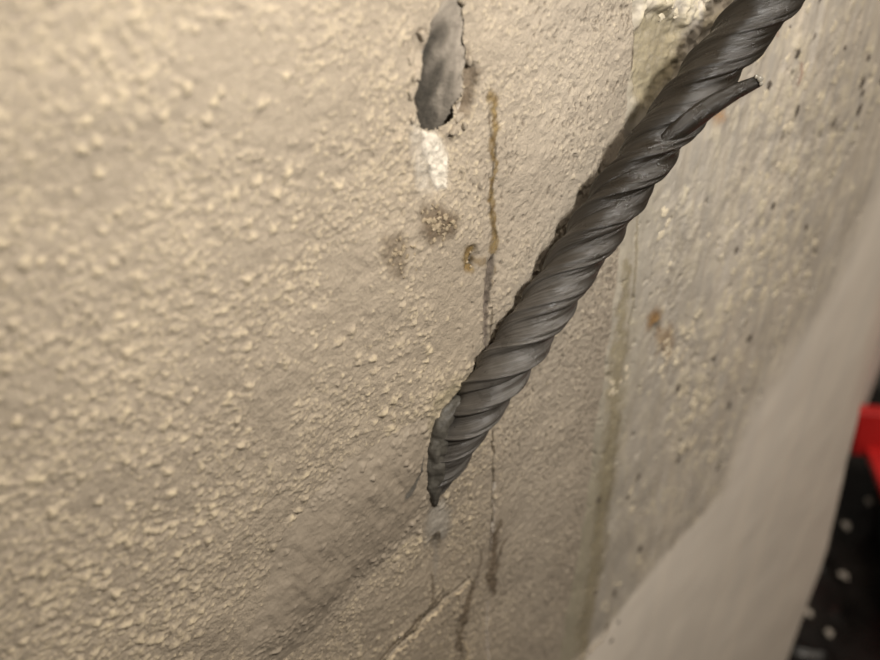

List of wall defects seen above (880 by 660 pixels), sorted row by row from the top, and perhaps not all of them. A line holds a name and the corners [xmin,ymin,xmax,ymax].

peeling [407,30,427,124]
spalling [454,55,477,130]
spalling [632,0,684,116]
corrosion [464,245,474,271]
crack [489,431,497,548]
crack [381,576,470,660]